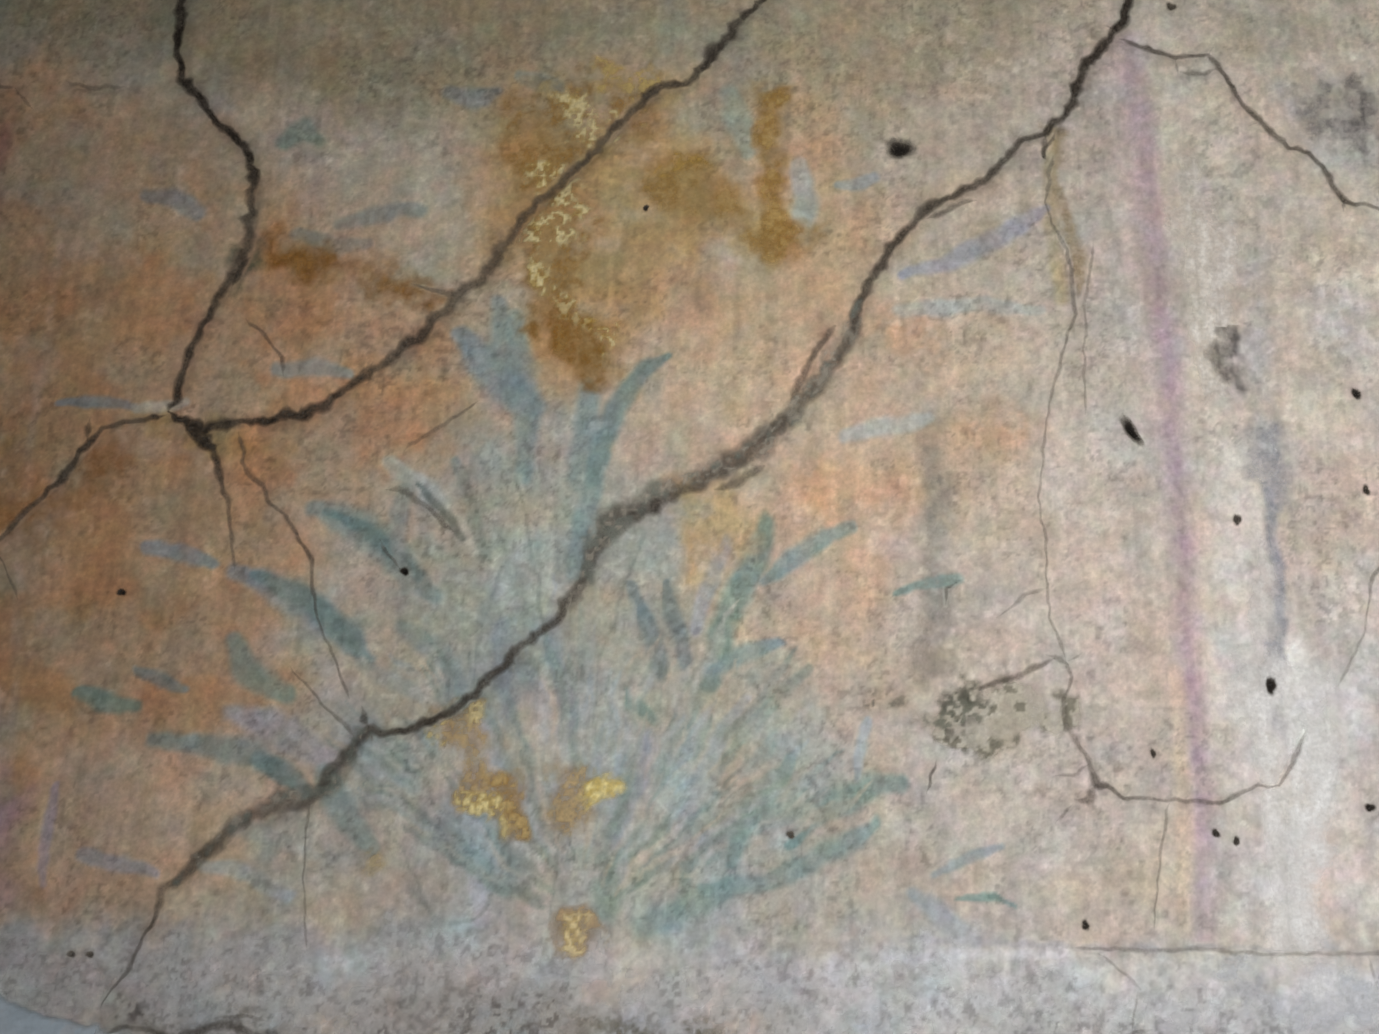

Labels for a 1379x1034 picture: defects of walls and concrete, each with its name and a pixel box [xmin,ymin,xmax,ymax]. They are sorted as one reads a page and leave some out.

crack [0,0,765,540]
crack [173,0,1358,884]
flaking render [933,678,1079,755]